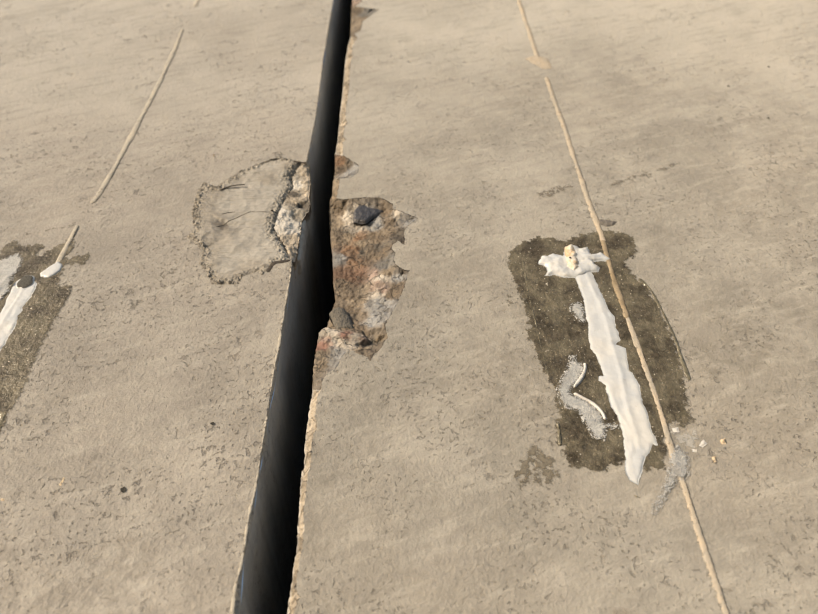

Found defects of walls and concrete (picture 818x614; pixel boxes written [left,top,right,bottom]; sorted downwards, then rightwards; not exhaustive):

leakage [0,239,90,431]
crack [217,209,278,227]
crack [266,259,293,272]
spalling [274,162,312,270]
spalling [287,0,418,614]
leakage [506,230,695,471]
leakage [514,446,560,486]